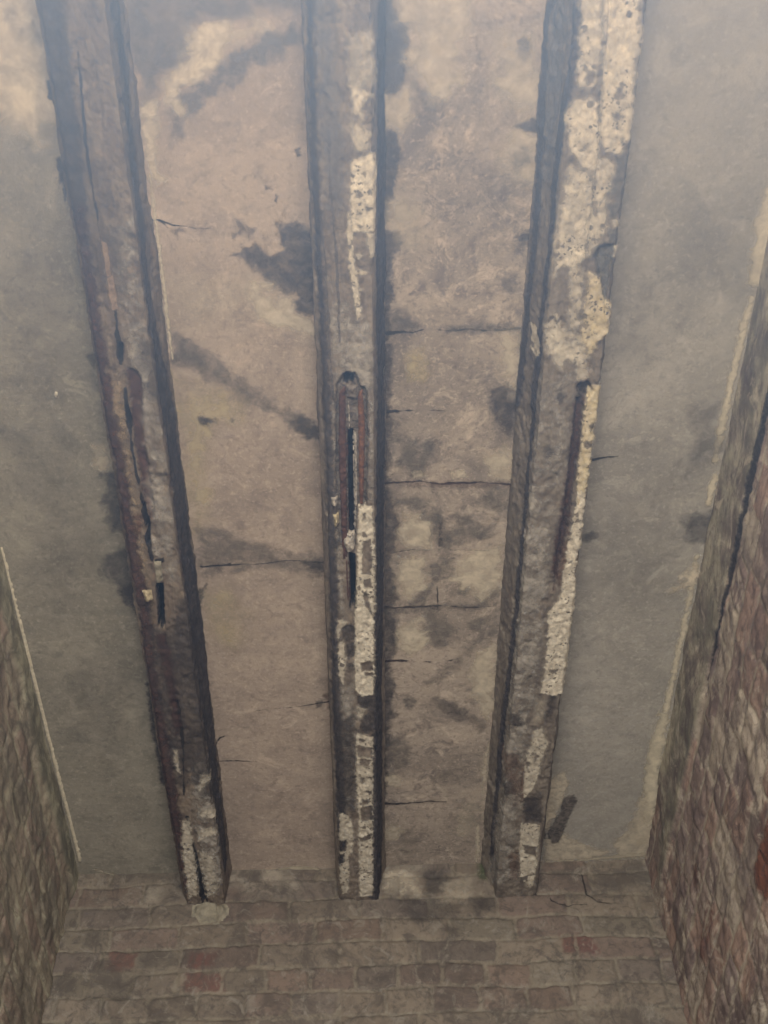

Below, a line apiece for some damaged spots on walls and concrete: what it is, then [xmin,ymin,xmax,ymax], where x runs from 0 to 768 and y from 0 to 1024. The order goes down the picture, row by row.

leakage [129,0,301,181]
peeling [347,85,377,321]
corrosion [40,0,189,893]
crack [200,560,321,568]
spalling [334,371,377,718]
leakage [234,0,502,810]
crack [384,589,490,609]
crack [385,478,511,486]
corrosion [552,381,591,590]
peeling [531,0,643,696]
peeling [339,733,374,897]
peeling [519,795,577,887]